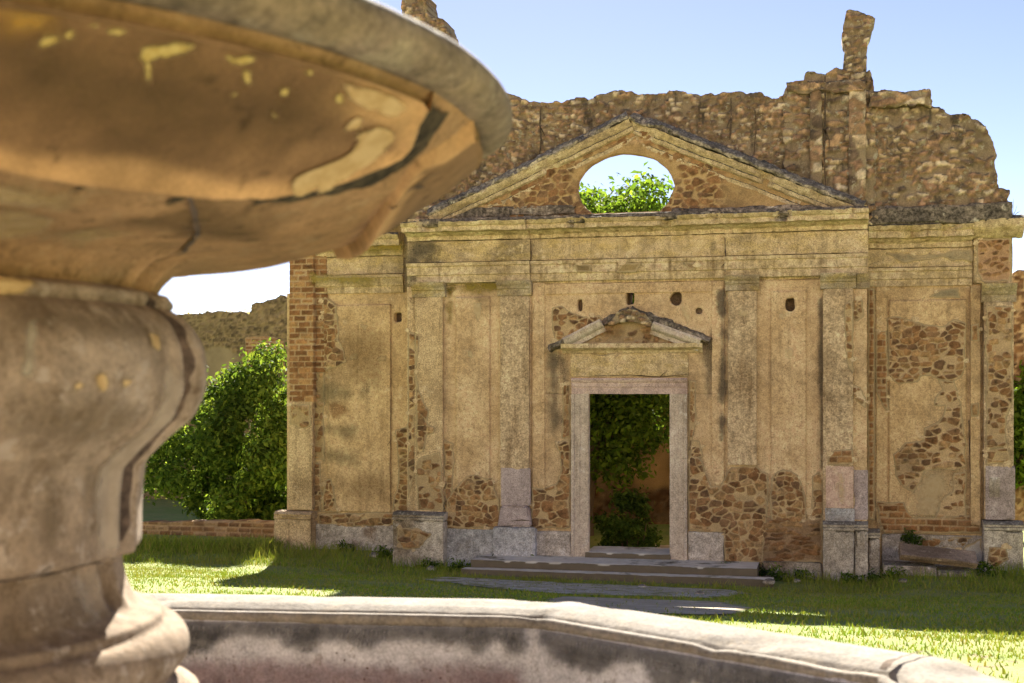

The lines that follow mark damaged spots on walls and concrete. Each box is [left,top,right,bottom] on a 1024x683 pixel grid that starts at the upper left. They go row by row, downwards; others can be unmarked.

peeling [293,86,407,197]
crack [155,197,201,261]
spalling [972,238,1012,283]
spalling [550,306,603,344]
water stain [717,290,726,316]
water stain [701,341,727,400]
spalling [287,297,500,552]
spalling [530,381,571,529]
spalling [687,288,1016,562]